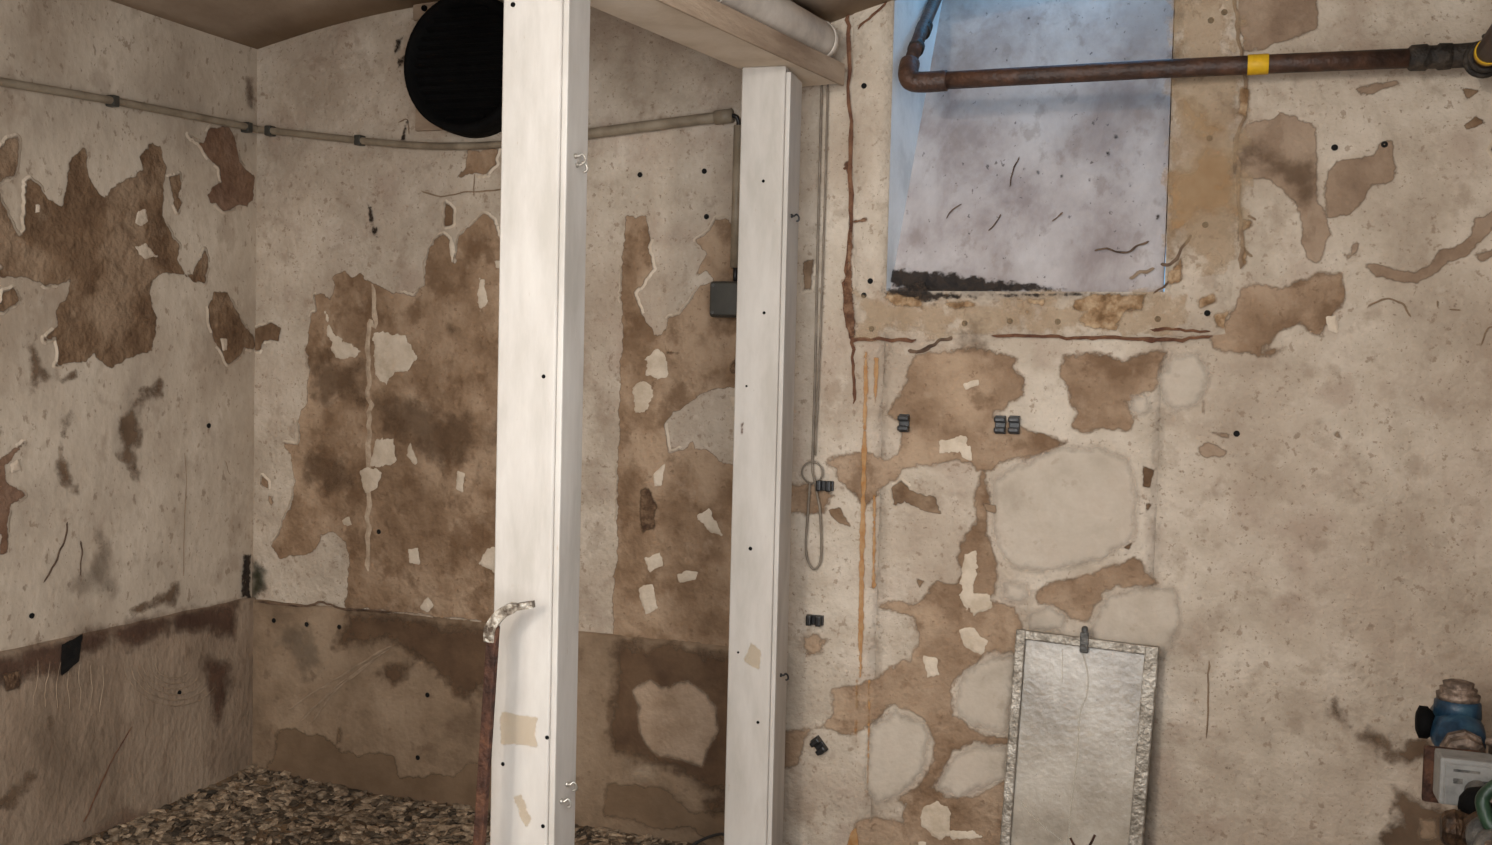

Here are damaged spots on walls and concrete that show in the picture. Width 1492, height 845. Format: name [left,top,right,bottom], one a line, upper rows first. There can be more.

peeling [0,124,281,370]
peeling [1199,87,1492,357]
peeling [0,439,28,555]
damp [0,555,265,684]
damp [206,661,229,723]
peeling [259,199,500,622]
damp [339,614,486,699]
peeling [612,215,736,646]
peeling [785,347,1166,845]